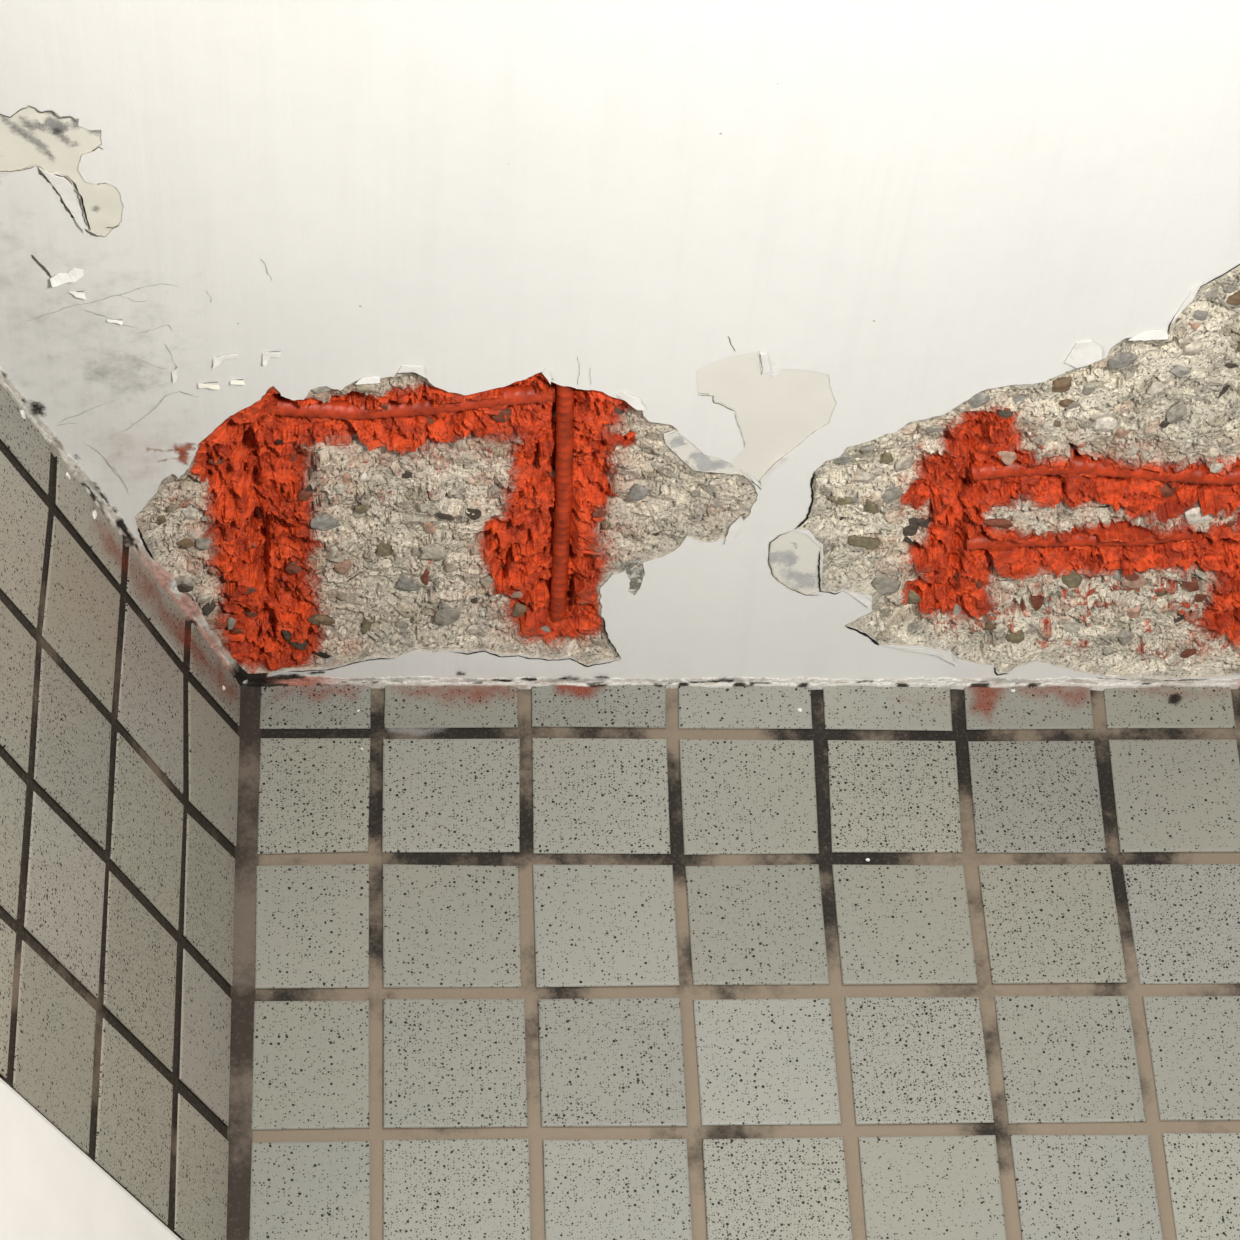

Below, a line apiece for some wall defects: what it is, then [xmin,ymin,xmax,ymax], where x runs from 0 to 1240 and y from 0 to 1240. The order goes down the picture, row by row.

peeling [0,105,123,237]
leakage [32,402,45,415]
crack [57,403,128,493]
crack [23,283,211,431]
spalling [135,351,836,674]
spalling [768,264,1240,681]